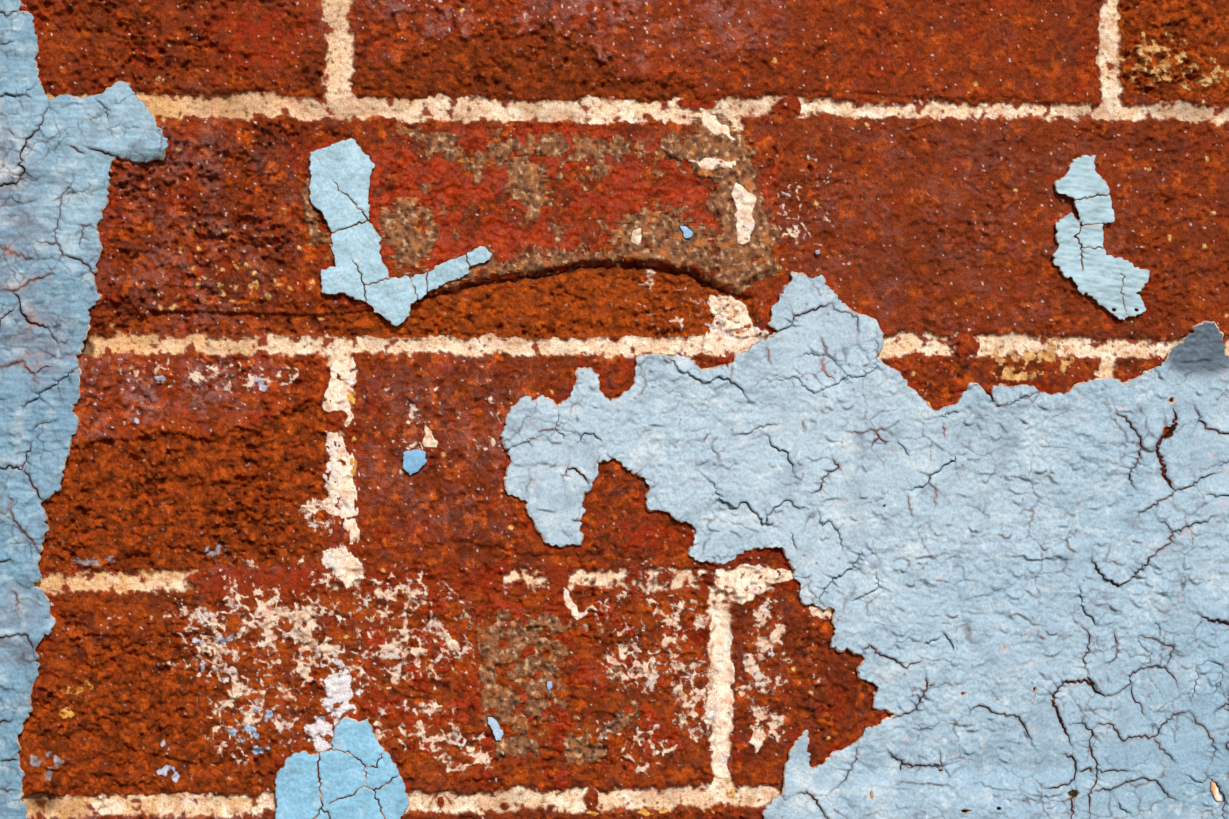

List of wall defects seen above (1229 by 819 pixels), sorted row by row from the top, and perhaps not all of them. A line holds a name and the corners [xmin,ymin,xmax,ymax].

crack [0,89,116,563]
damp [150,556,504,773]
spalling [0,0,686,819]
crack [512,411,601,484]
damp [582,558,716,777]
crack [670,359,746,397]
peeling [308,19,1229,819]
crack [709,422,879,601]
crack [767,305,879,394]
crack [861,633,954,717]
crack [970,705,1033,744]
crack [1044,408,1229,819]